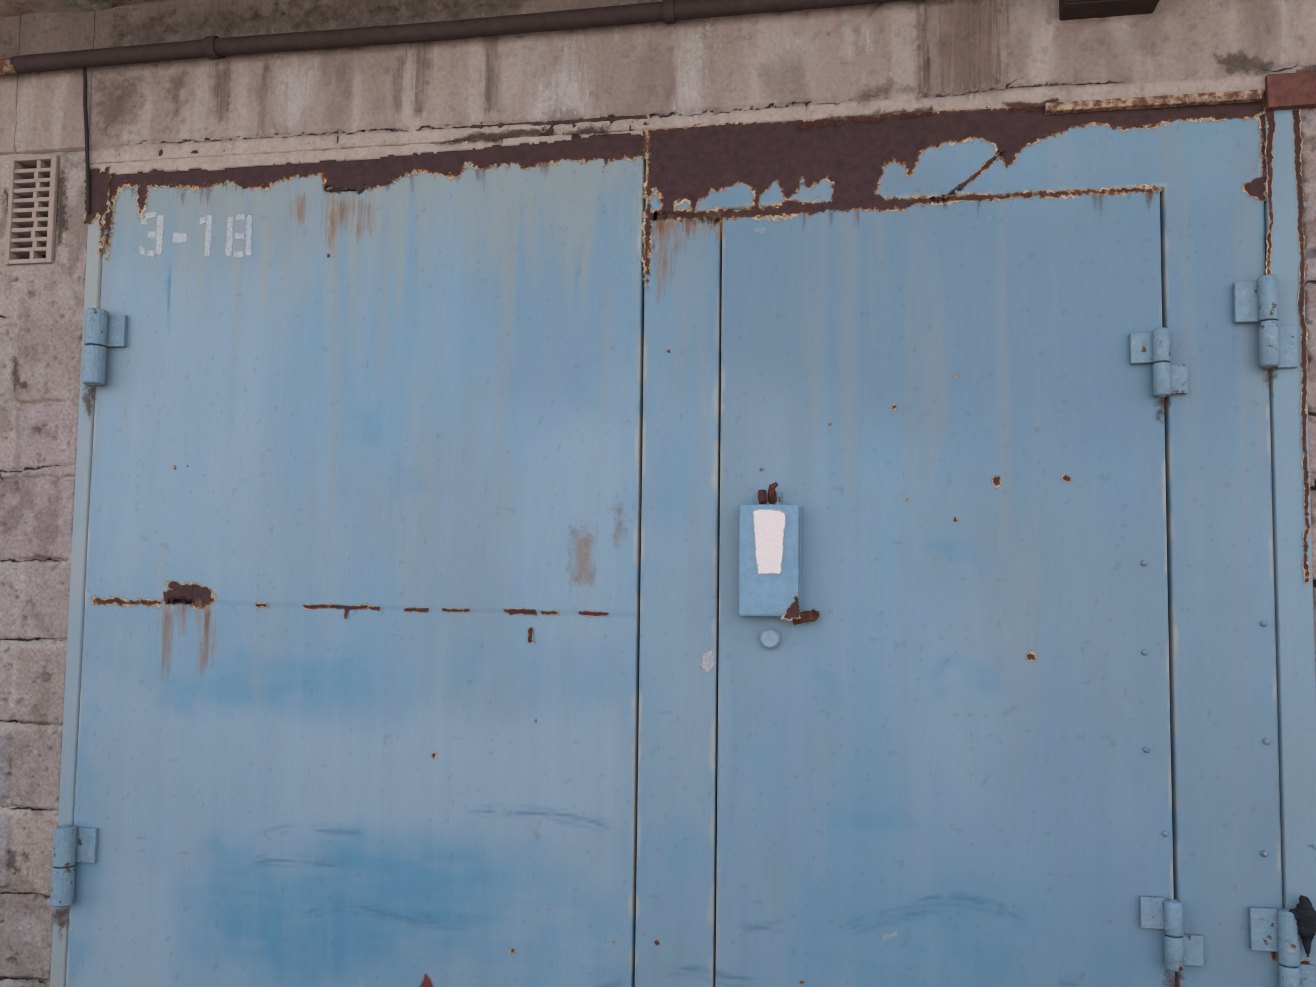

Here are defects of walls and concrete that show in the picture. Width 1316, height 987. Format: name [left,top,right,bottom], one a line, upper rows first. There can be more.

spalling [797,107,933,130]
spalling [1006,98,1059,112]
spalling [440,126,609,144]
rust [83,93,1276,292]
rust [1292,109,1311,583]
rust [83,387,94,415]
rust [91,580,217,640]
rust [303,603,381,619]
rust [503,608,559,644]